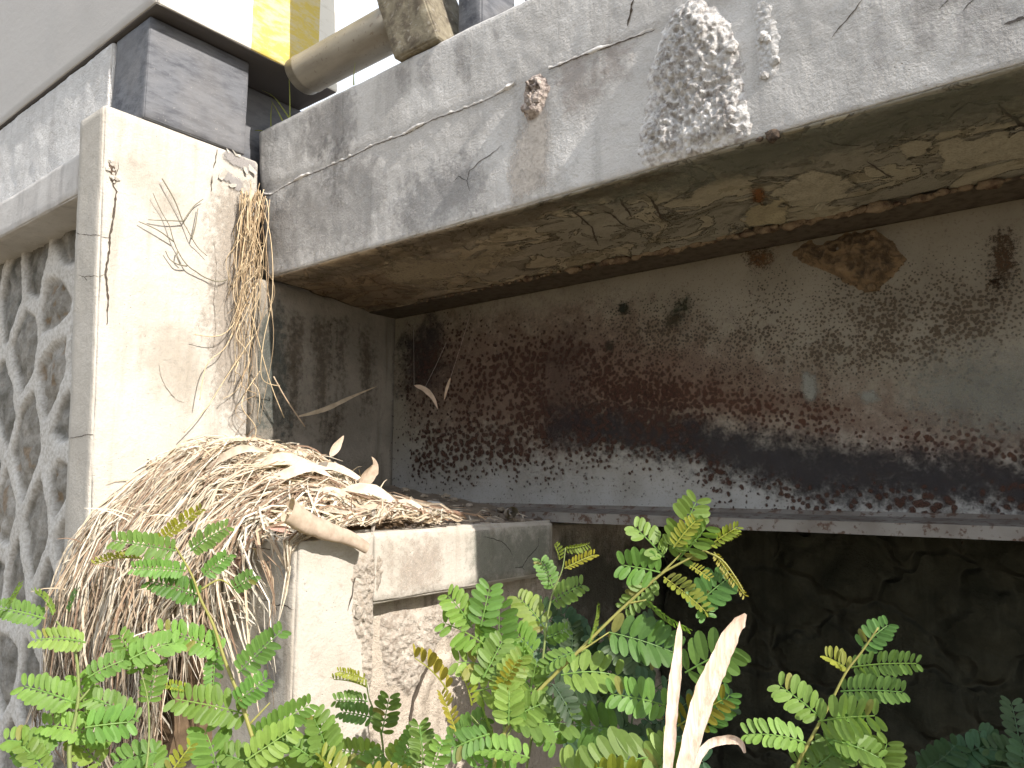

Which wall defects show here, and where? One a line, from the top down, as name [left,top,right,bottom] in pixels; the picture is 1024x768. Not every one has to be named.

crack [551,0,654,69]
peeling [219,149,257,193]
crack [264,85,514,196]
spalling [755,129,781,144]
peeling [897,126,1024,172]
crack [77,164,119,324]
spalling [415,170,1024,305]
rust [389,227,1024,515]
leakage [545,402,1024,514]
spalling [351,553,457,729]